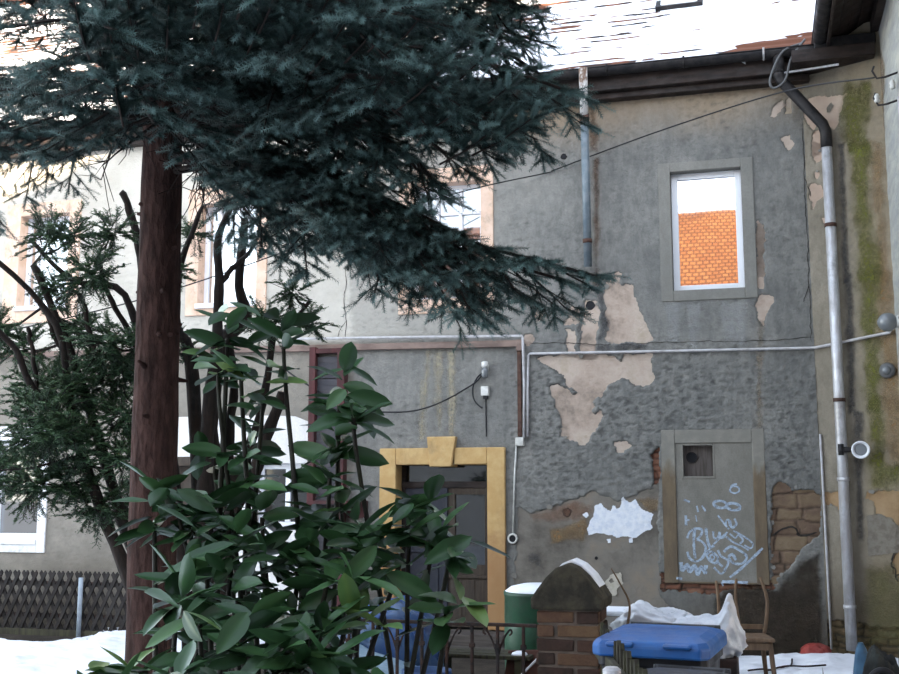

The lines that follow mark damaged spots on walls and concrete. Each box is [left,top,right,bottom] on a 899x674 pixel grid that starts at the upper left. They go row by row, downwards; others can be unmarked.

spalling [770,98,792,118]
spalling [808,93,847,129]
spalling [781,135,794,150]
spalling [804,114,824,209]
spalling [755,220,774,326]
leakage [839,82,899,538]
spalling [537,271,655,445]
spalling [614,441,632,453]
spalling [865,490,899,526]
spalling [510,447,839,608]
spalling [828,620,899,658]